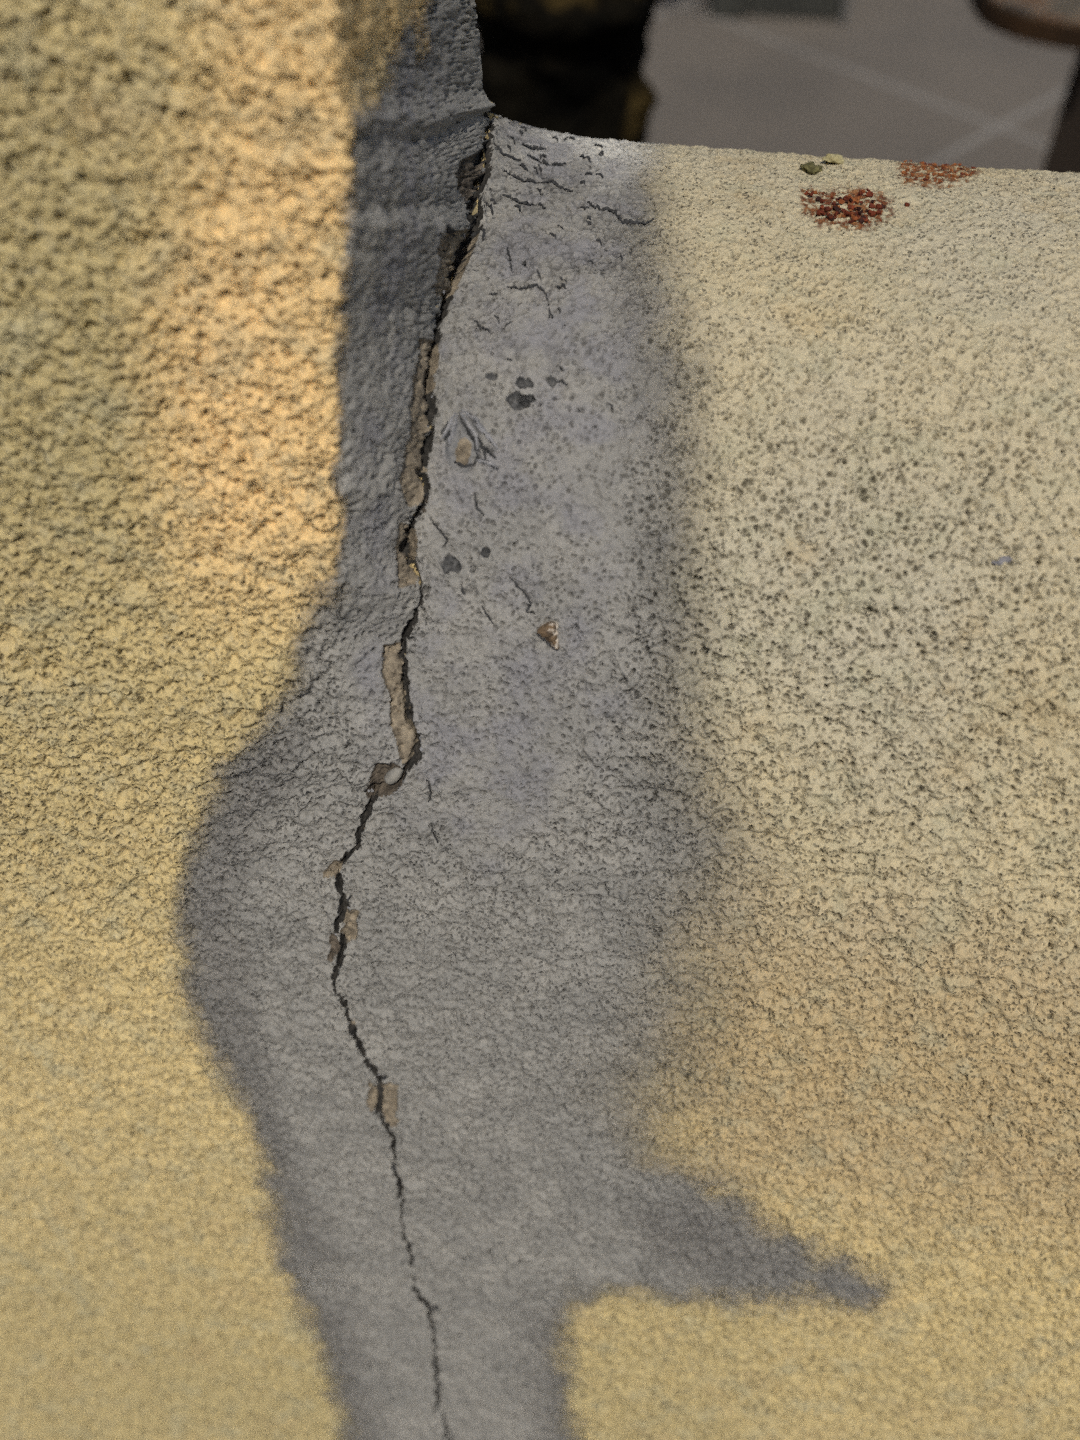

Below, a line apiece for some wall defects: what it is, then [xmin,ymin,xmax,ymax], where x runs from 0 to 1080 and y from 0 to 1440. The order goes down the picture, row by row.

crack [323,106,654,1440]